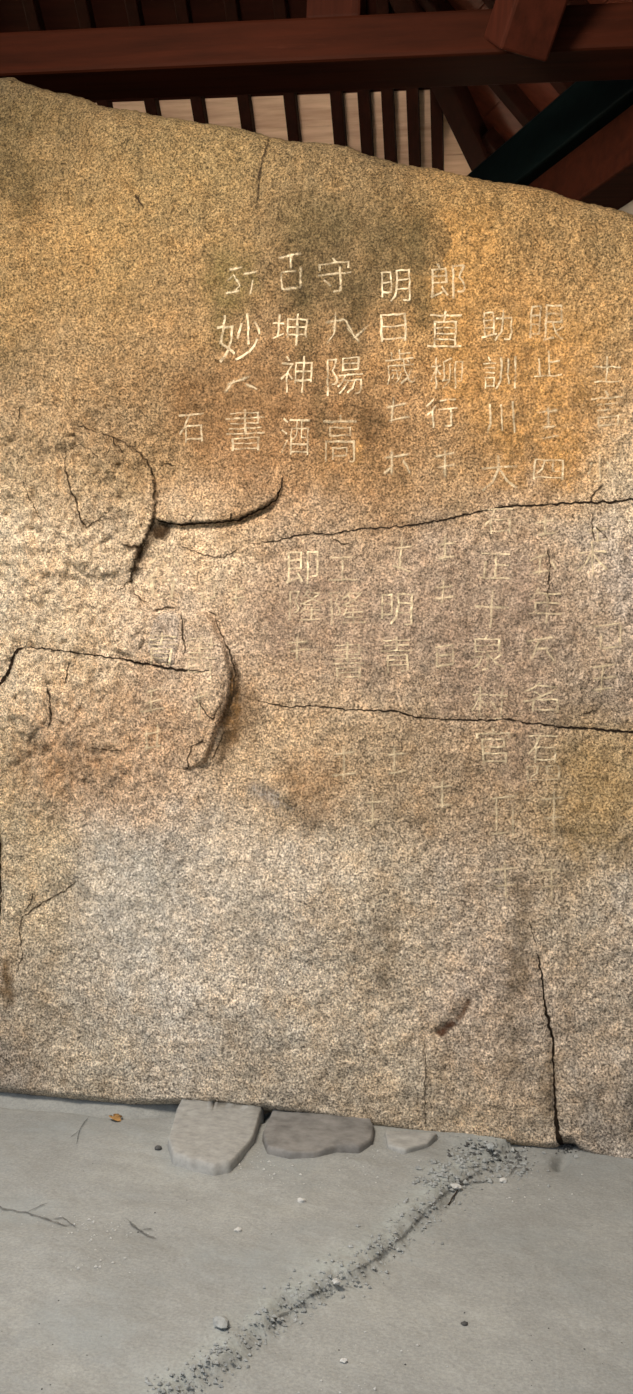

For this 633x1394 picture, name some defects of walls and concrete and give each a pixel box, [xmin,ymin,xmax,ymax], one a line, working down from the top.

crack [0,424,633,770]
crack [0,842,77,971]
crack [421,1038,429,1124]
crack [529,917,564,1145]
crack [361,1154,519,1267]
crack [272,1288,323,1325]